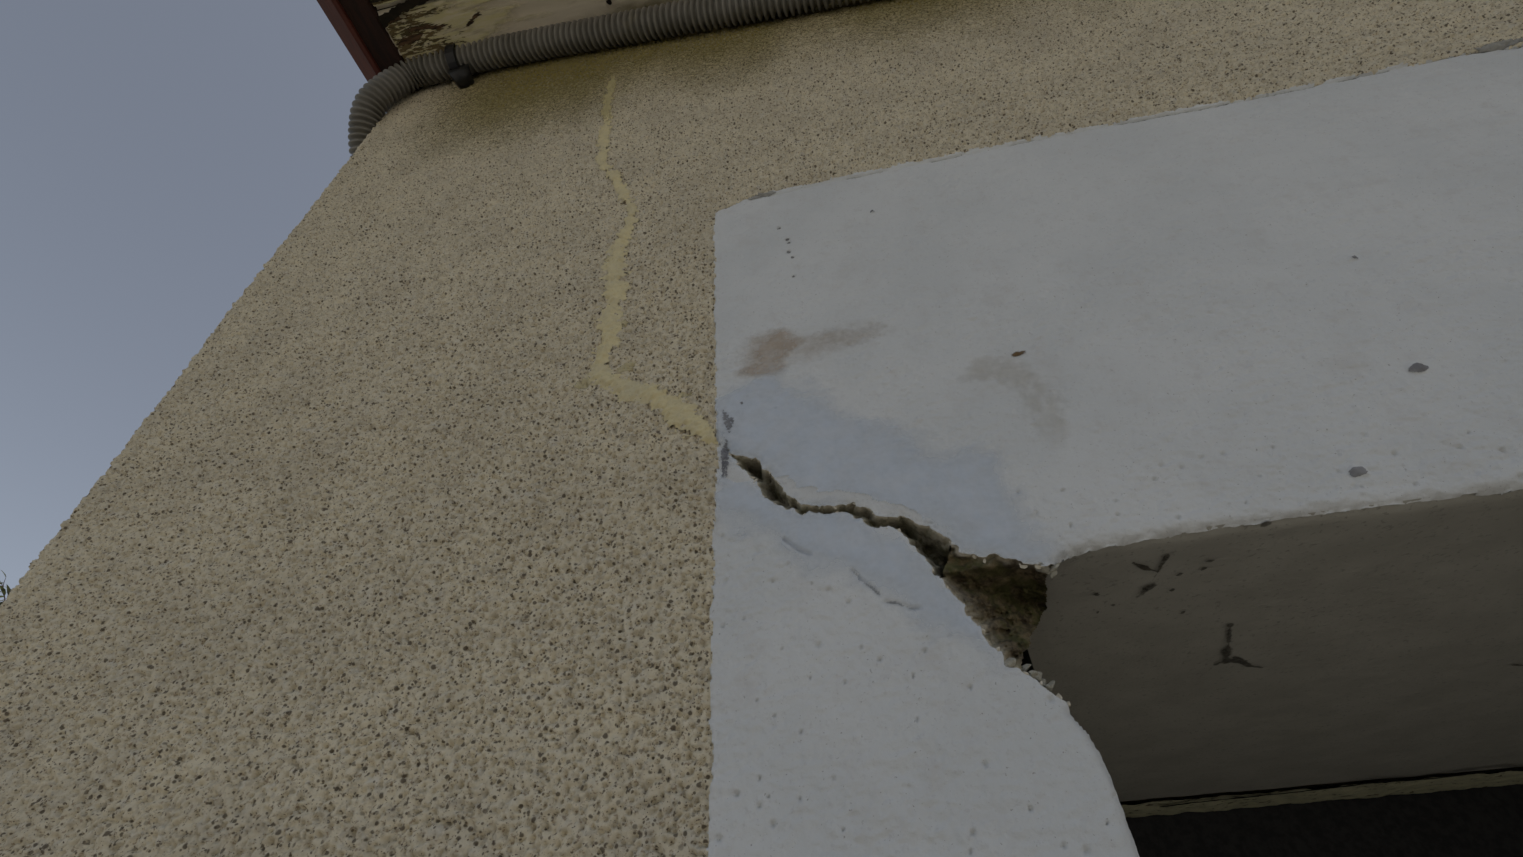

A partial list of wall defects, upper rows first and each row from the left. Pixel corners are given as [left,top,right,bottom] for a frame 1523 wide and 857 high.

crack [574,76,953,577]